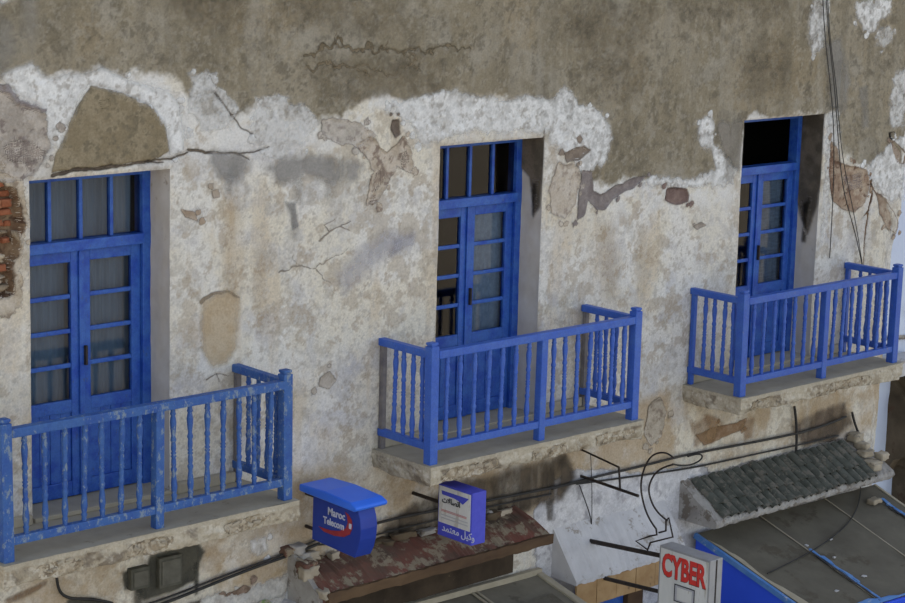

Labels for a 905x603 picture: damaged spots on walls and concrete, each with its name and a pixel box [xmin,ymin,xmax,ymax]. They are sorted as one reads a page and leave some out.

peeling [0,64,238,318]
crack [51,93,269,177]
peeling [248,86,738,227]
spalling [821,70,905,243]
flaking render [200,290,240,365]